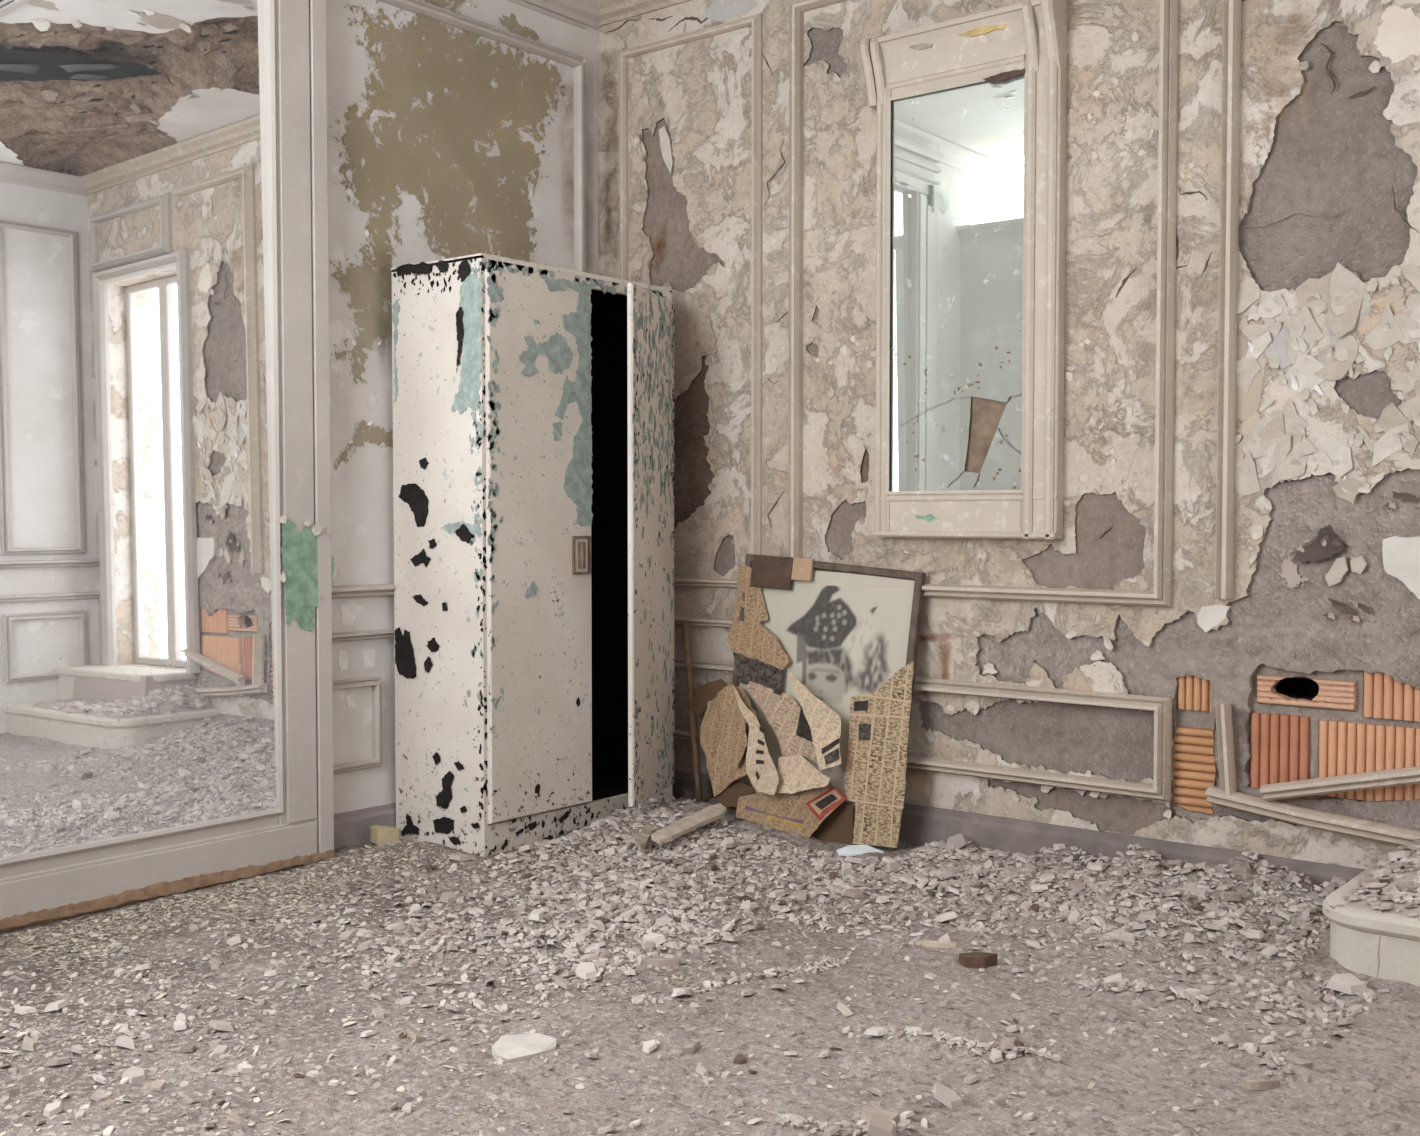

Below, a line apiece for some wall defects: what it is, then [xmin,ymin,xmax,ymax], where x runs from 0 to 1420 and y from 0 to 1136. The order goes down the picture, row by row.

flaking render [804,23,850,80]
peeling [328,0,569,384]
flaking render [632,118,751,305]
flaking render [674,335,746,543]
peeling [803,330,876,398]
flaking render [919,0,1420,834]
peeling [277,515,362,631]